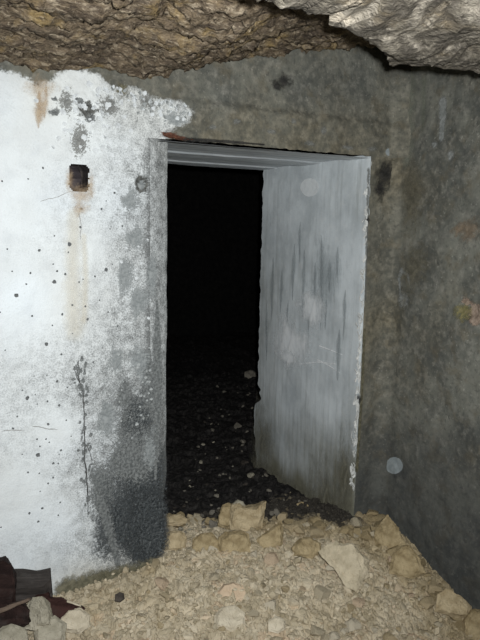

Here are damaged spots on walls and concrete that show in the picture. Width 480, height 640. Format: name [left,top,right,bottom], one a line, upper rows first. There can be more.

water stain [52,81,126,165]
rust [161,132,265,145]
spalling [349,169,370,491]
crack [71,356,93,514]
water stain [55,299,170,596]